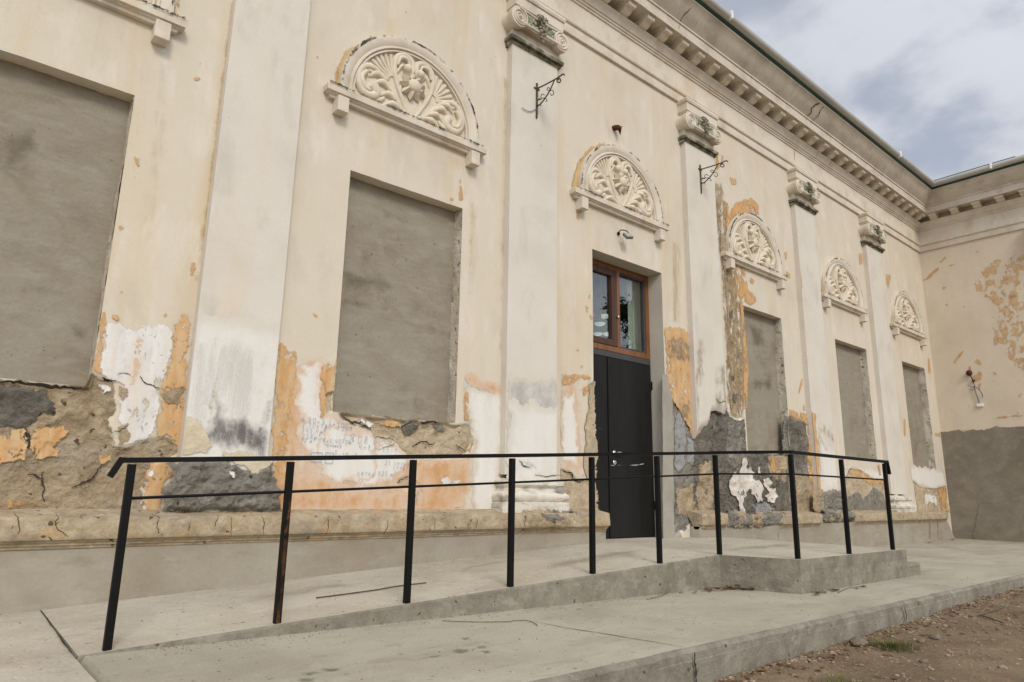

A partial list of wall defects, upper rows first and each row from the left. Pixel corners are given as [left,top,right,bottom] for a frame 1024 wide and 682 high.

peeling [730,198,759,220]
peeling [975,255,1024,371]
flaking render [0,312,305,512]
water stain [209,420,265,447]
flaking render [326,392,474,459]
flaking render [523,381,599,532]
flaking render [664,233,886,533]